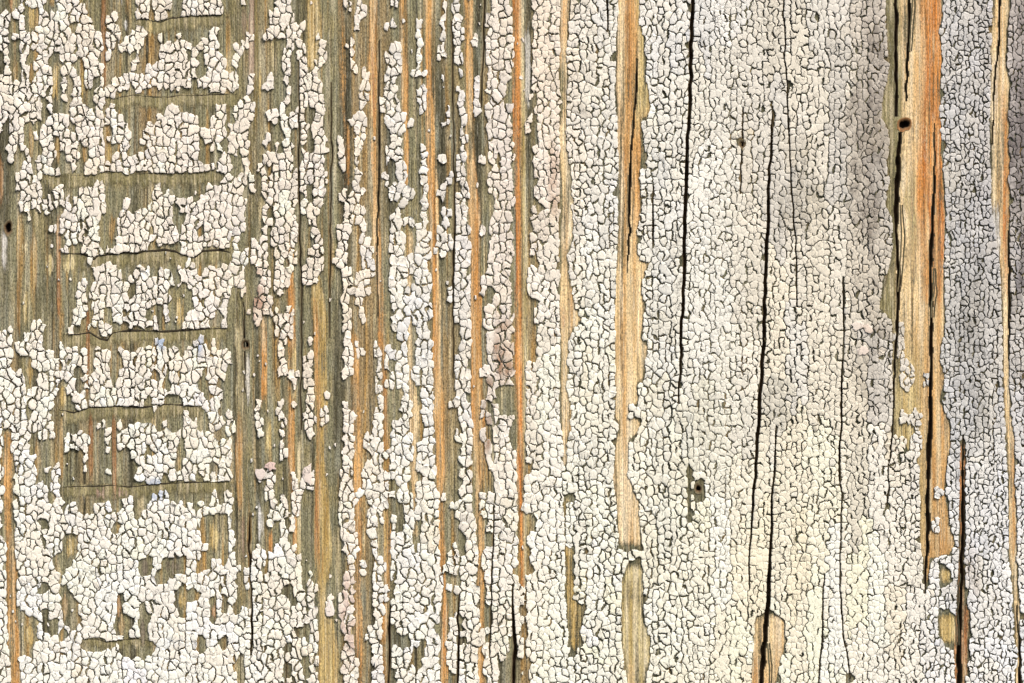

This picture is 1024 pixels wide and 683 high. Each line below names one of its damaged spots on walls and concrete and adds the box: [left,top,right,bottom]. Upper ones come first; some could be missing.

crack [71,480,221,488]
peeling [0,0,346,683]
crack [624,59,655,273]
peeling [325,0,1024,683]
crack [676,0,695,404]
crack [739,0,798,683]
crack [885,0,938,594]
crack [954,435,966,683]